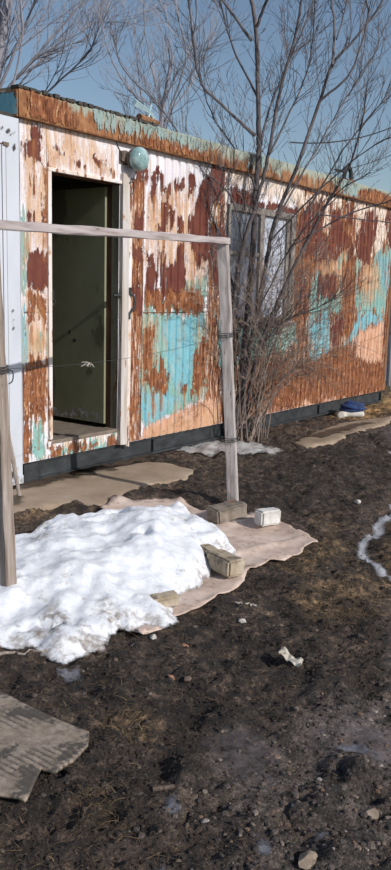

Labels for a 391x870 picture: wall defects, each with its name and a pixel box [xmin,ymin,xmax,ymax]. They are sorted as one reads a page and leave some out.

peeling [0,91,17,114]
peeling [1,122,44,196]
corrosion [24,90,114,251]
peeling [76,153,115,179]
peeling [94,108,212,153]
peeling [13,205,48,387]
corrosion [23,288,117,463]
corrosion [119,133,229,442]
peeling [132,154,391,440]
corrosion [234,187,391,417]